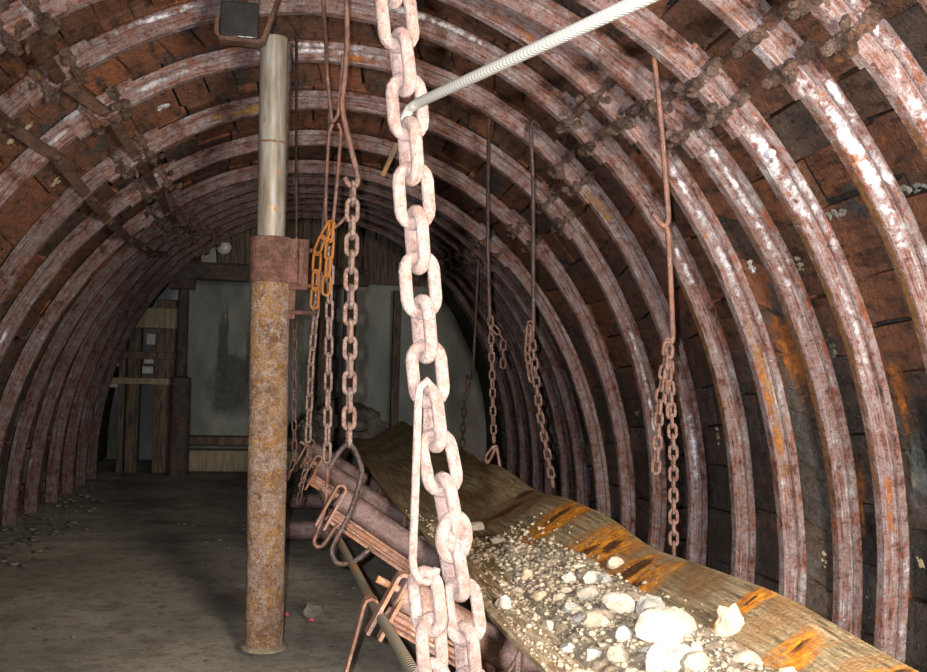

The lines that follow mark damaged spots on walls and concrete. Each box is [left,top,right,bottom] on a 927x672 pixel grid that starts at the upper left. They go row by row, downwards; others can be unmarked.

leakage [743,126,818,230]
leakage [800,80,895,224]
corrosion [756,345,775,414]
corrosion [773,189,893,546]